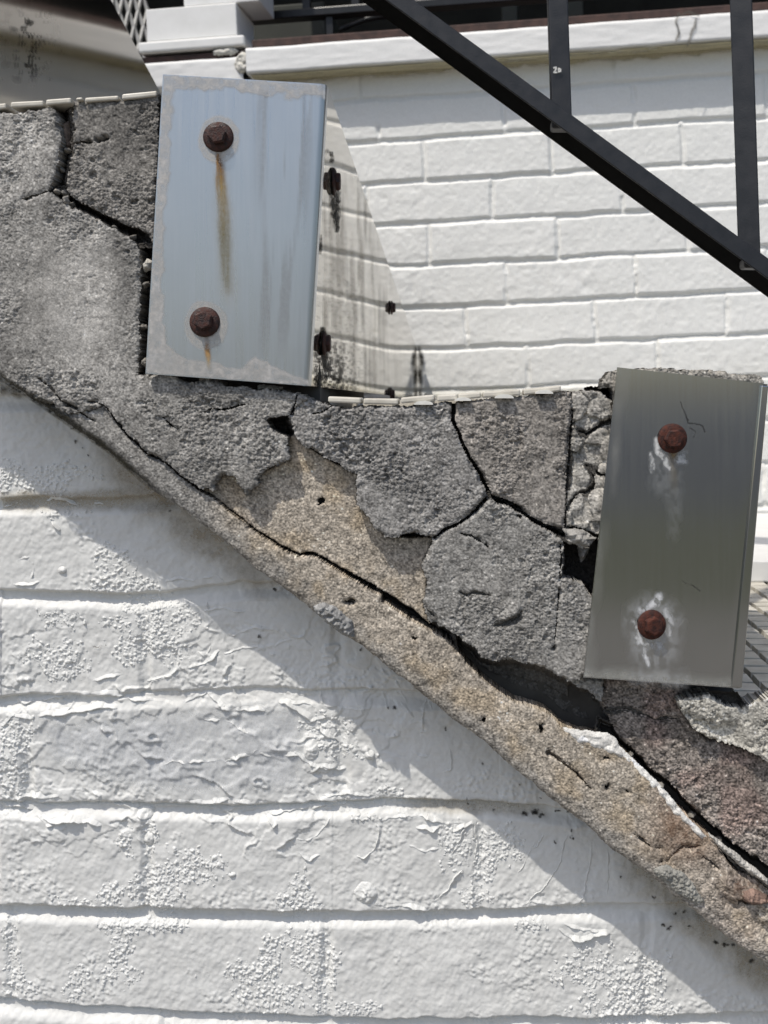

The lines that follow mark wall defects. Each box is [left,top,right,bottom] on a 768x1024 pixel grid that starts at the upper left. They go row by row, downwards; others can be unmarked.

crack [24,107,153,333]
rust [217,154,228,255]
crack [38,378,458,650]
spalling [203,414,432,623]
crack [433,391,611,649]
peeling [0,673,155,727]
peeling [165,689,346,774]
crack [682,690,746,706]
peeling [3,790,102,828]
peeling [164,797,254,805]
crack [594,706,768,905]
peeling [356,812,480,911]